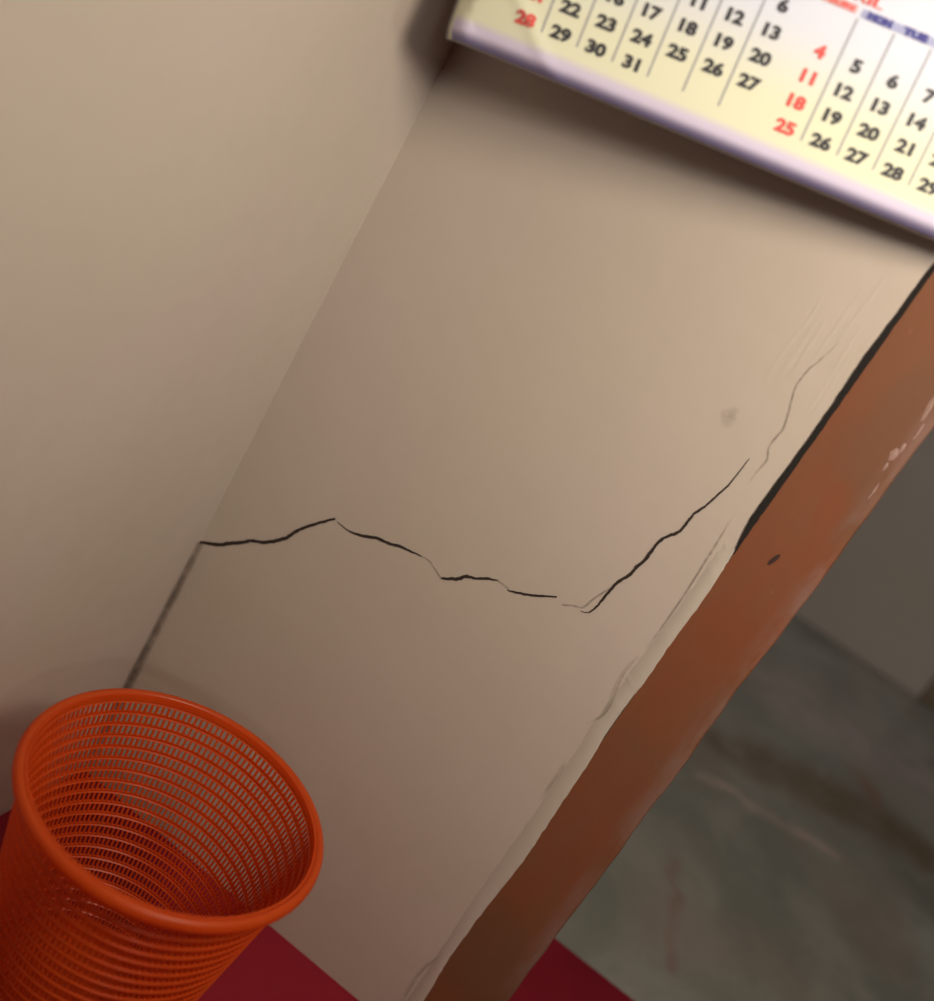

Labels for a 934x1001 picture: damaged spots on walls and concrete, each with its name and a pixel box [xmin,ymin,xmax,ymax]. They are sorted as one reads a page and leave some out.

crack [200,518,421,557]
crack [581,459,749,613]
crack [441,574,557,598]